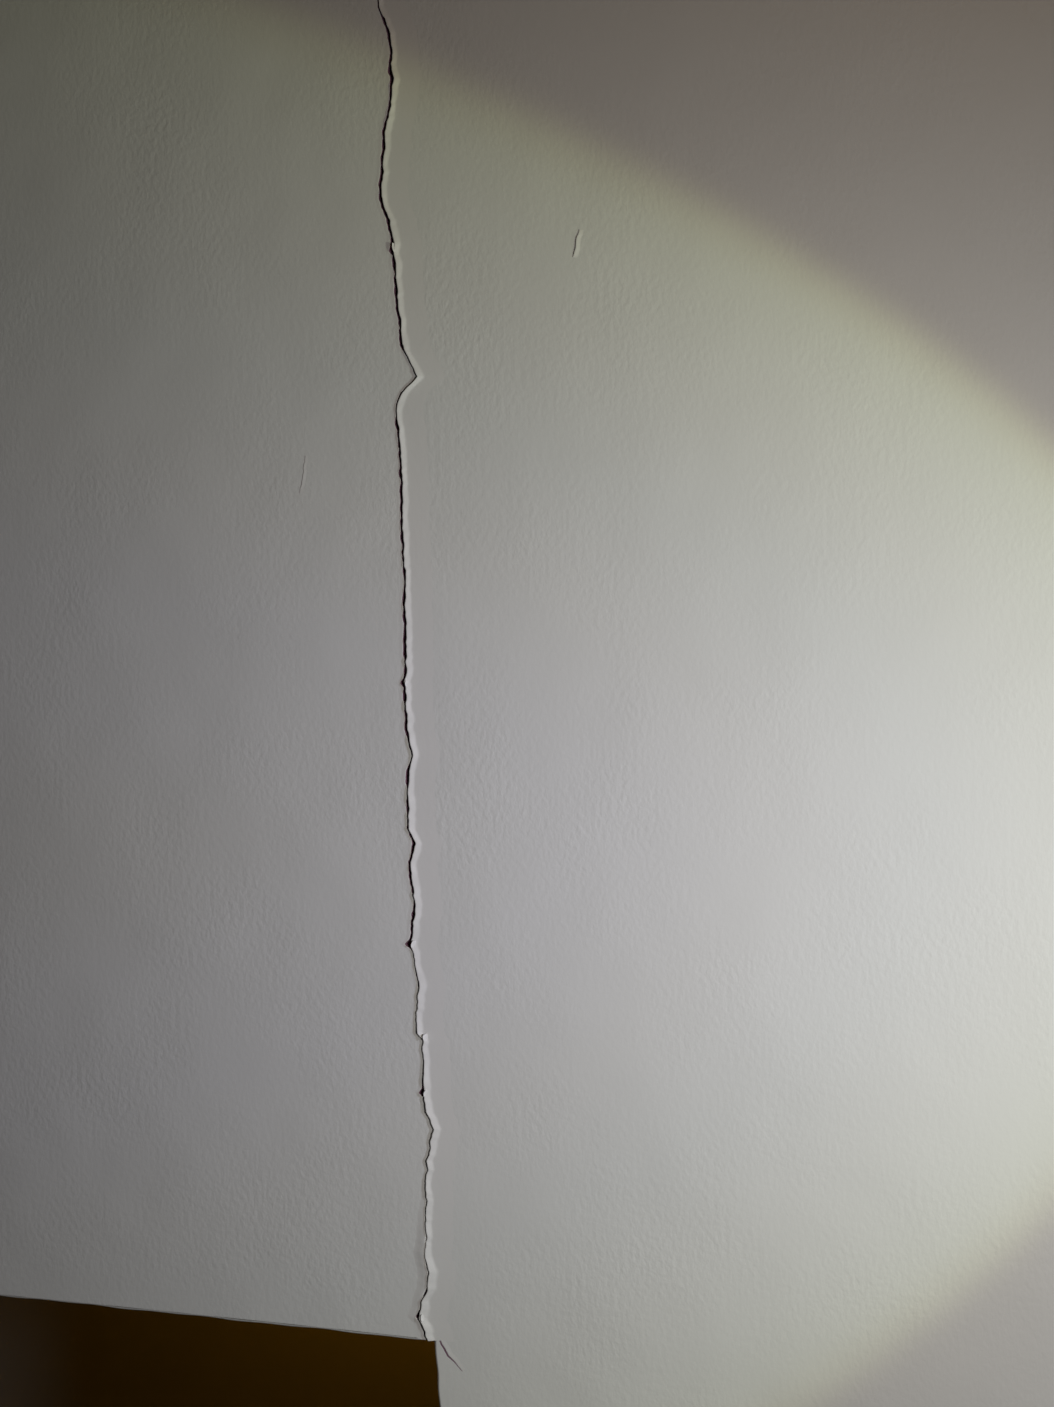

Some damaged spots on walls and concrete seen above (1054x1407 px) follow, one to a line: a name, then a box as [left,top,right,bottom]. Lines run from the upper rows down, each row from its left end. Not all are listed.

crack [374,0,465,1371]